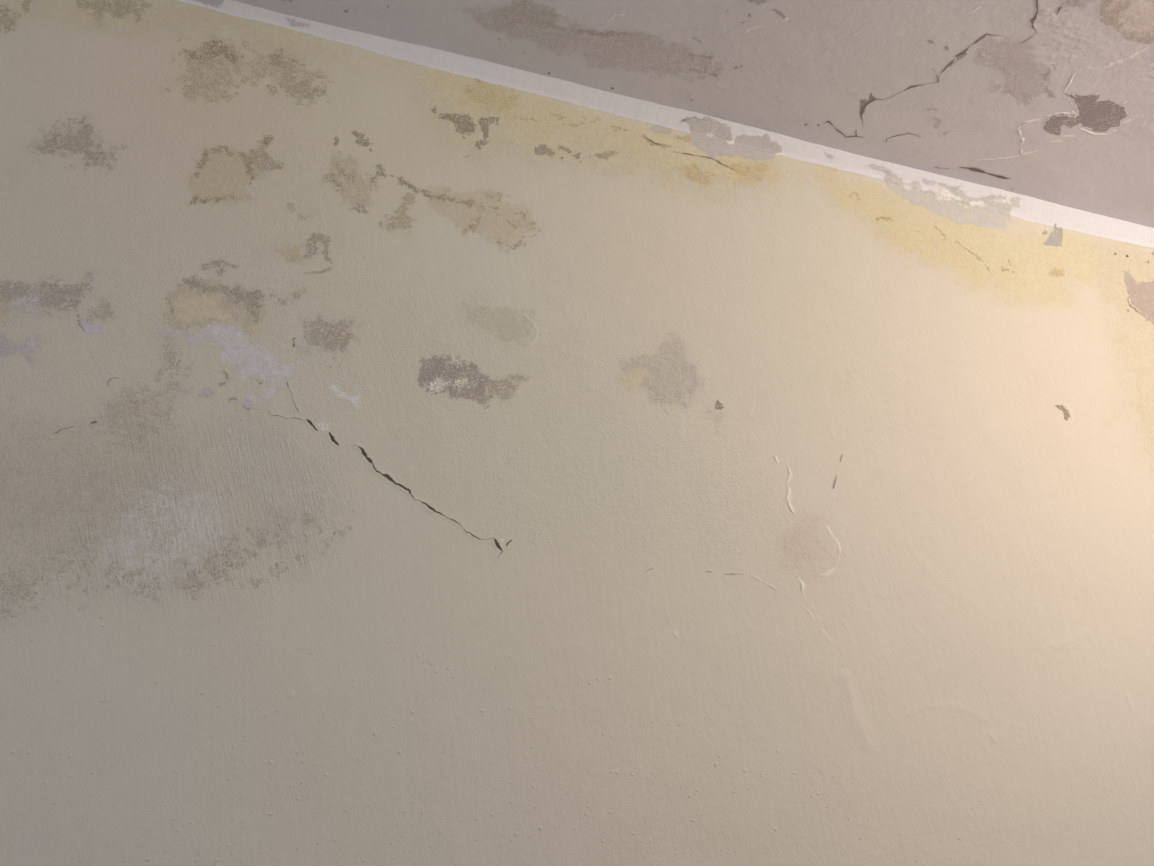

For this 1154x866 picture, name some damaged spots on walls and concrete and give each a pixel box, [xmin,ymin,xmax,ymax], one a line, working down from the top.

crack [824,0,1060,138]
peeling [979,0,1154,161]
crack [935,167,1012,189]
peeling [1123,269,1154,324]
peeling [417,353,529,409]
crack [266,380,515,560]